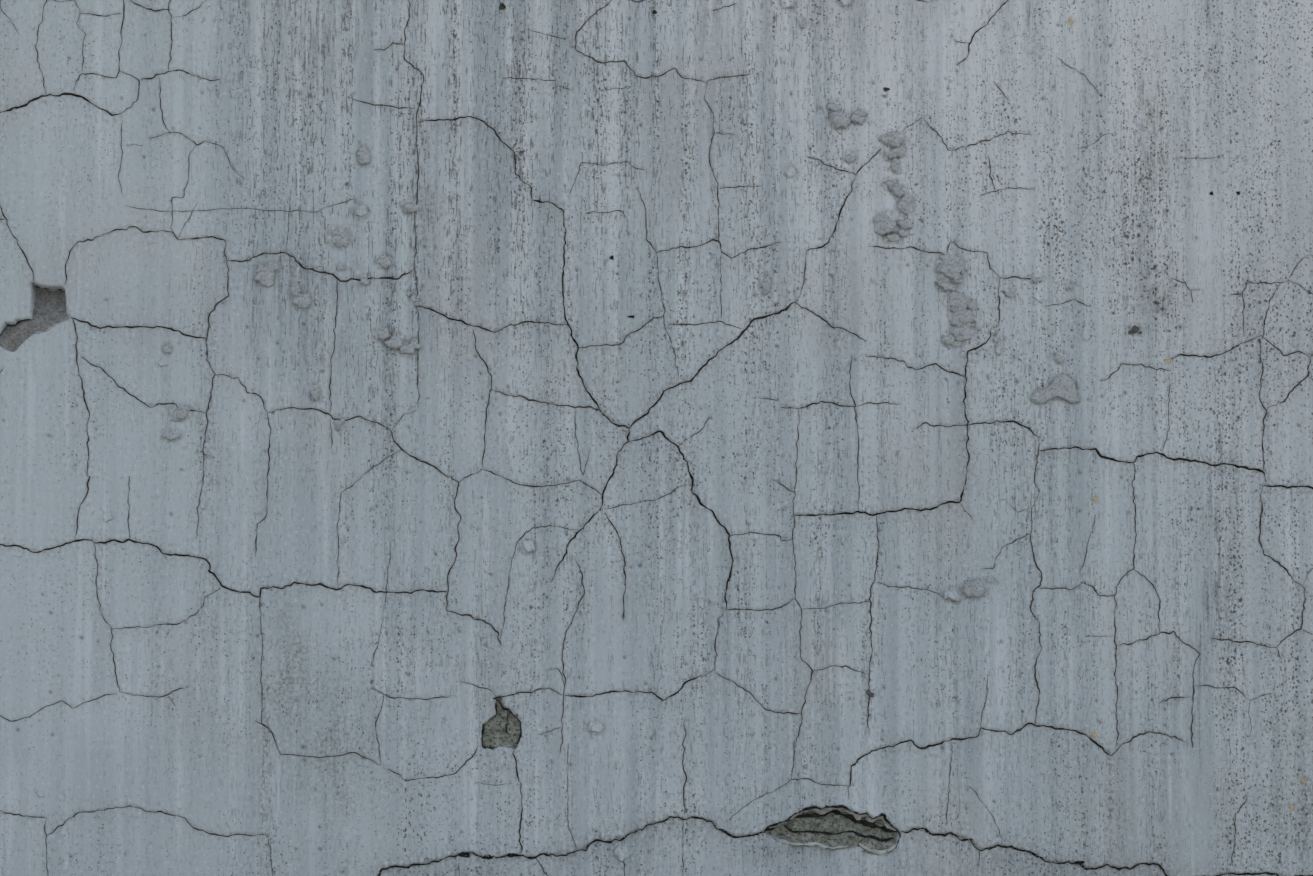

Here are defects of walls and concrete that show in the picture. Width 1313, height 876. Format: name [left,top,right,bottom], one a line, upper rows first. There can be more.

spalling [0,286,69,352]
crack [0,0,1038,751]
crack [727,255,1313,826]
crack [256,688,480,781]
spalling [481,696,522,749]
crack [0,806,273,876]
crack [378,719,765,876]
spalling [764,805,901,855]
crack [901,810,1168,876]
crack [1204,799,1313,876]